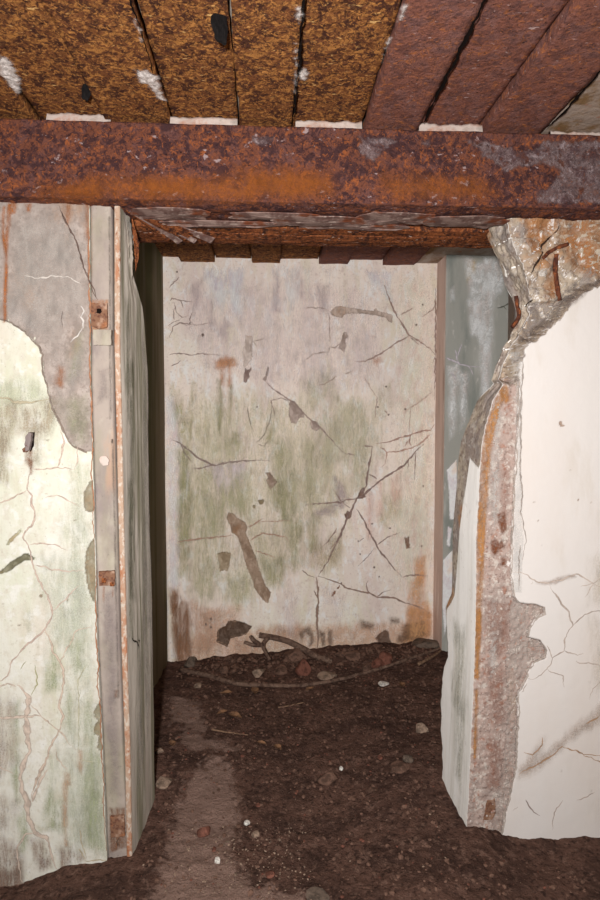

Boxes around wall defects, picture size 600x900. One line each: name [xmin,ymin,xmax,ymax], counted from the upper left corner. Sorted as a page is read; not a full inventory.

rust [3,205,14,322]
spalling [0,554,35,574]
spalling [0,202,92,453]
crack [0,433,92,803]
crack [59,206,98,300]
rust [87,206,107,560]
spalling [227,512,271,603]
crack [292,0,305,120]
leakage [166,397,431,661]
crack [173,285,480,648]
spalling [443,218,600,835]
rust [468,140,600,204]